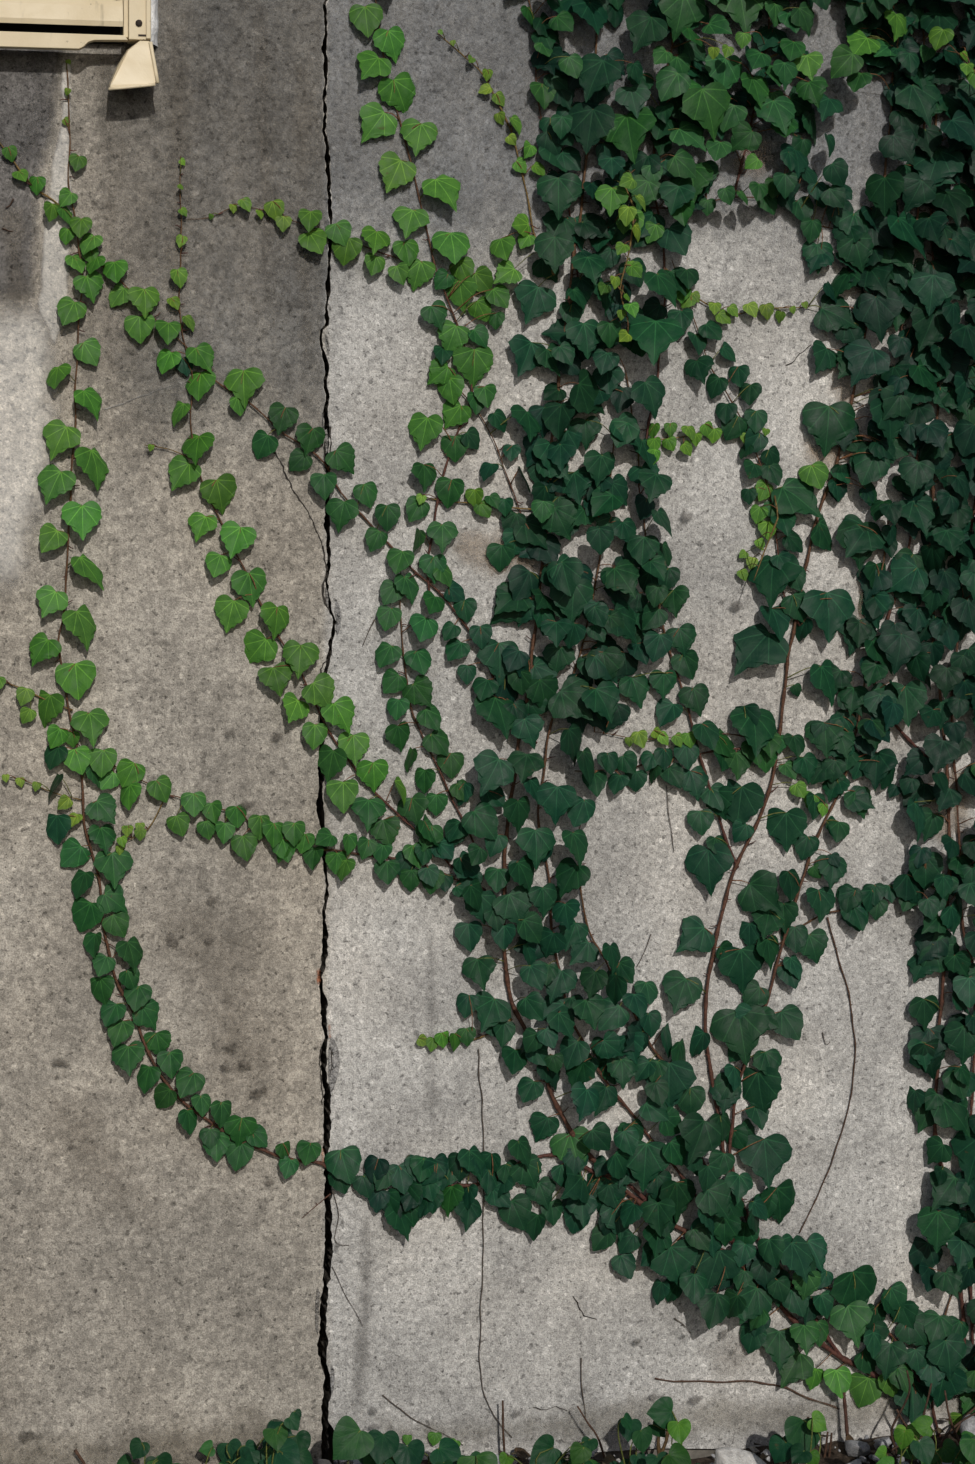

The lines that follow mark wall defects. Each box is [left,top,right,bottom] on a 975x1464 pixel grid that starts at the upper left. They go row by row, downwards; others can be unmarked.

crack [273,0,336,1460]